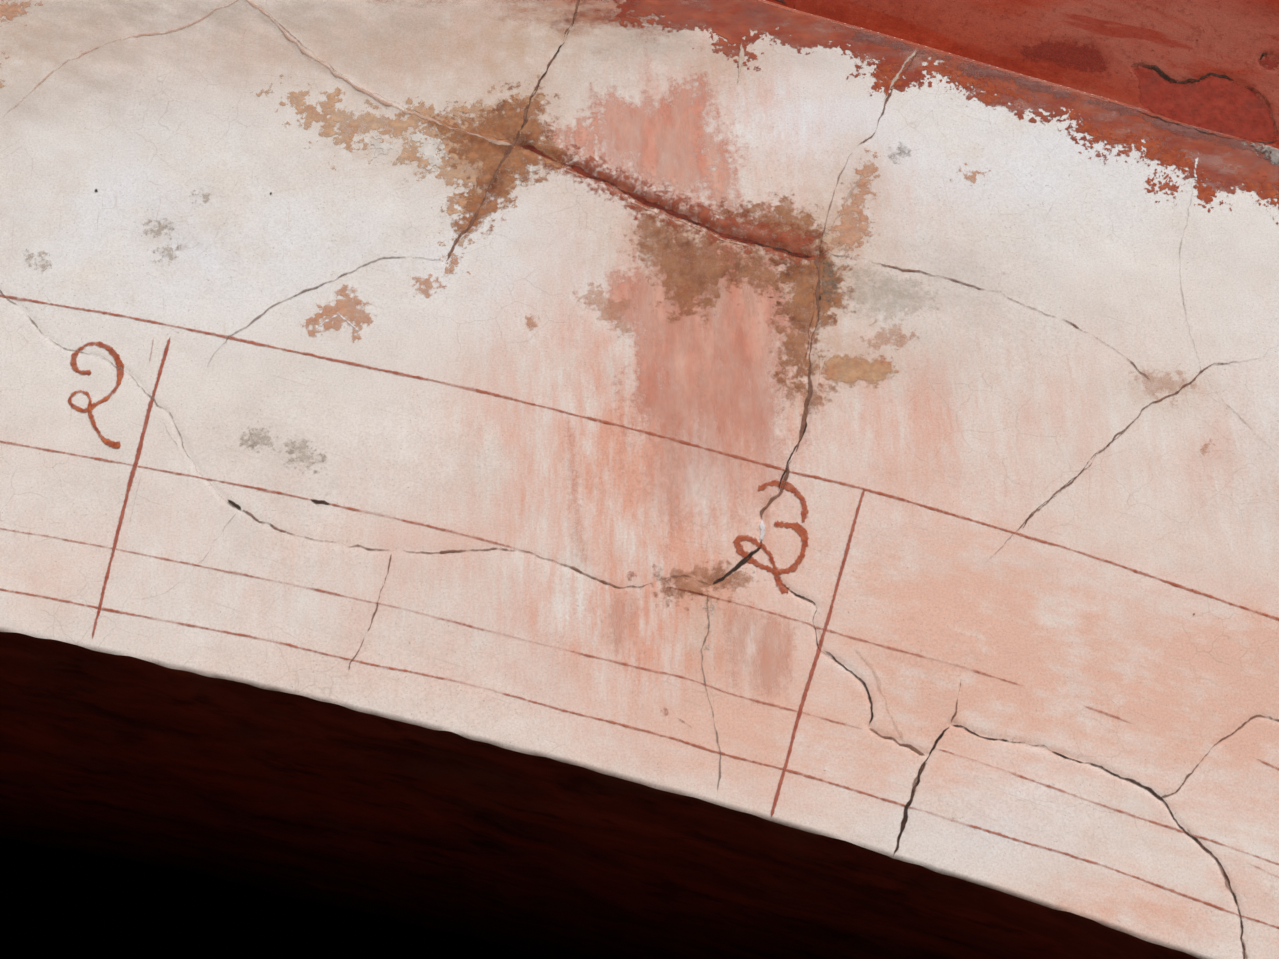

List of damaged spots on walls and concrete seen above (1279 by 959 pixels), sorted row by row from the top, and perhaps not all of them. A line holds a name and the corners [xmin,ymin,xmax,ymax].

peeling [256,85,565,224]
damp [548,75,740,212]
crack [860,50,918,144]
peeling [519,0,1279,224]
peeling [302,285,373,341]
peeling [412,230,475,298]
crack [135,0,860,786]
damp [585,241,855,436]
crack [882,264,981,289]
crack [1010,361,1236,538]
damp [655,561,748,606]
crack [786,587,1279,959]